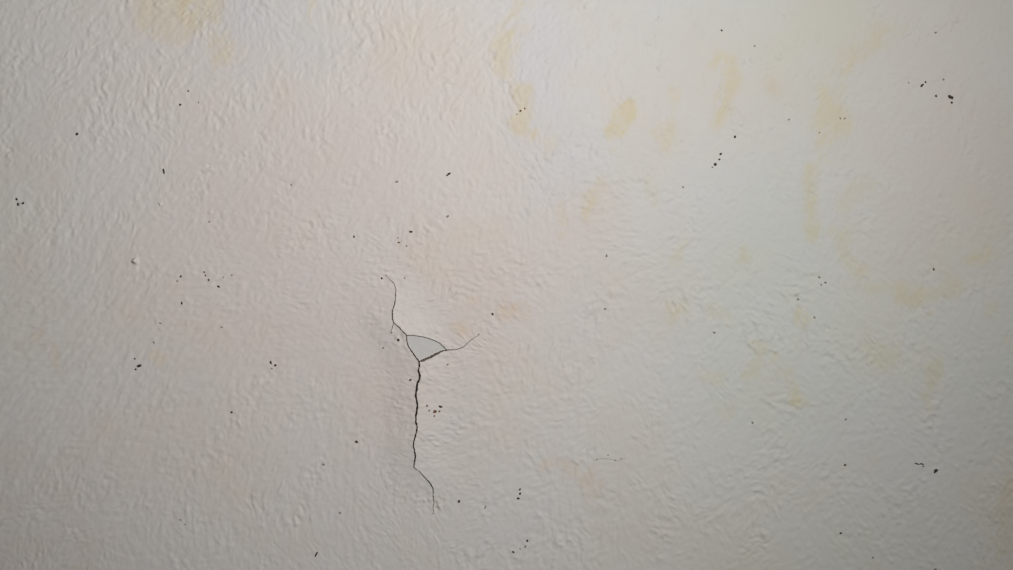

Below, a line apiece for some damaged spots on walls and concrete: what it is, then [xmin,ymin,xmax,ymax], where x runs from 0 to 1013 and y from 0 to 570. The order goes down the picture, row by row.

flaking render [407,334,448,359]
crack [386,275,479,514]